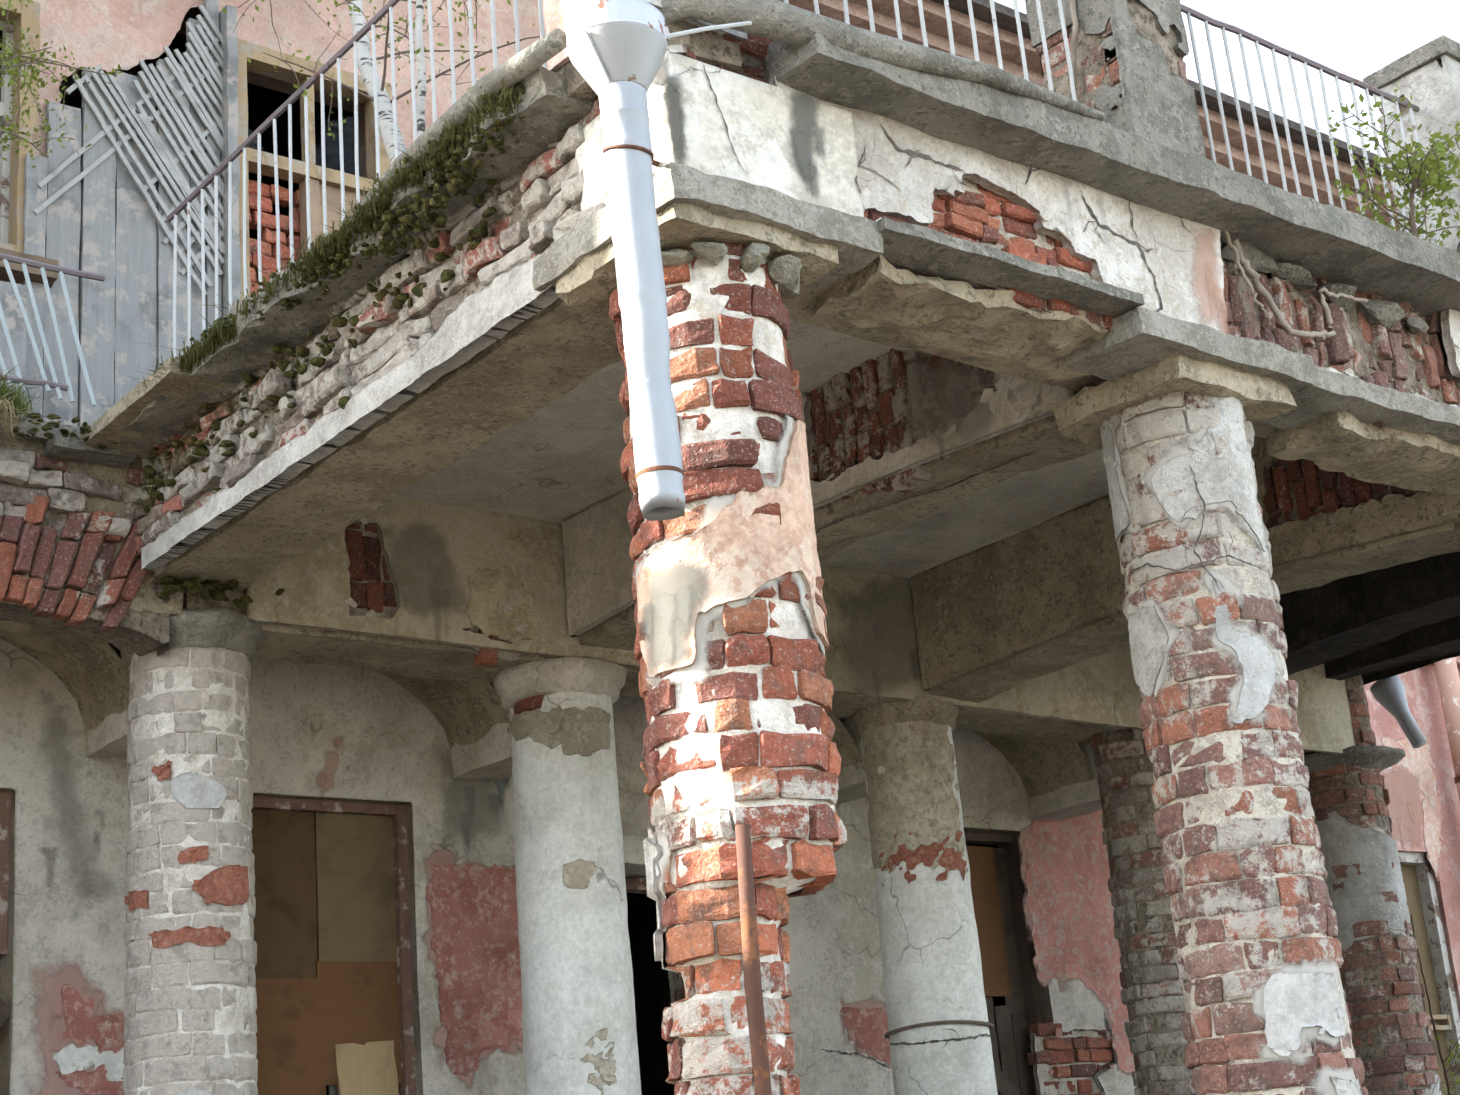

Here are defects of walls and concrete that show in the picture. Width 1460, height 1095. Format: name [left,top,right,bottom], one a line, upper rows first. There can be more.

crack [680,59,744,170]
crack [855,124,972,213]
spalling [864,178,1099,281]
crack [1025,165,1041,184]
crack [1081,190,1200,312]
spalling [1222,258,1460,405]
flaking render [1127,598,1179,697]
flaking render [1205,571,1283,724]
peeling [424,849,523,1088]
flaking render [642,830,679,976]
peeling [1019,810,1135,1095]
flaking render [1253,810,1413,1063]